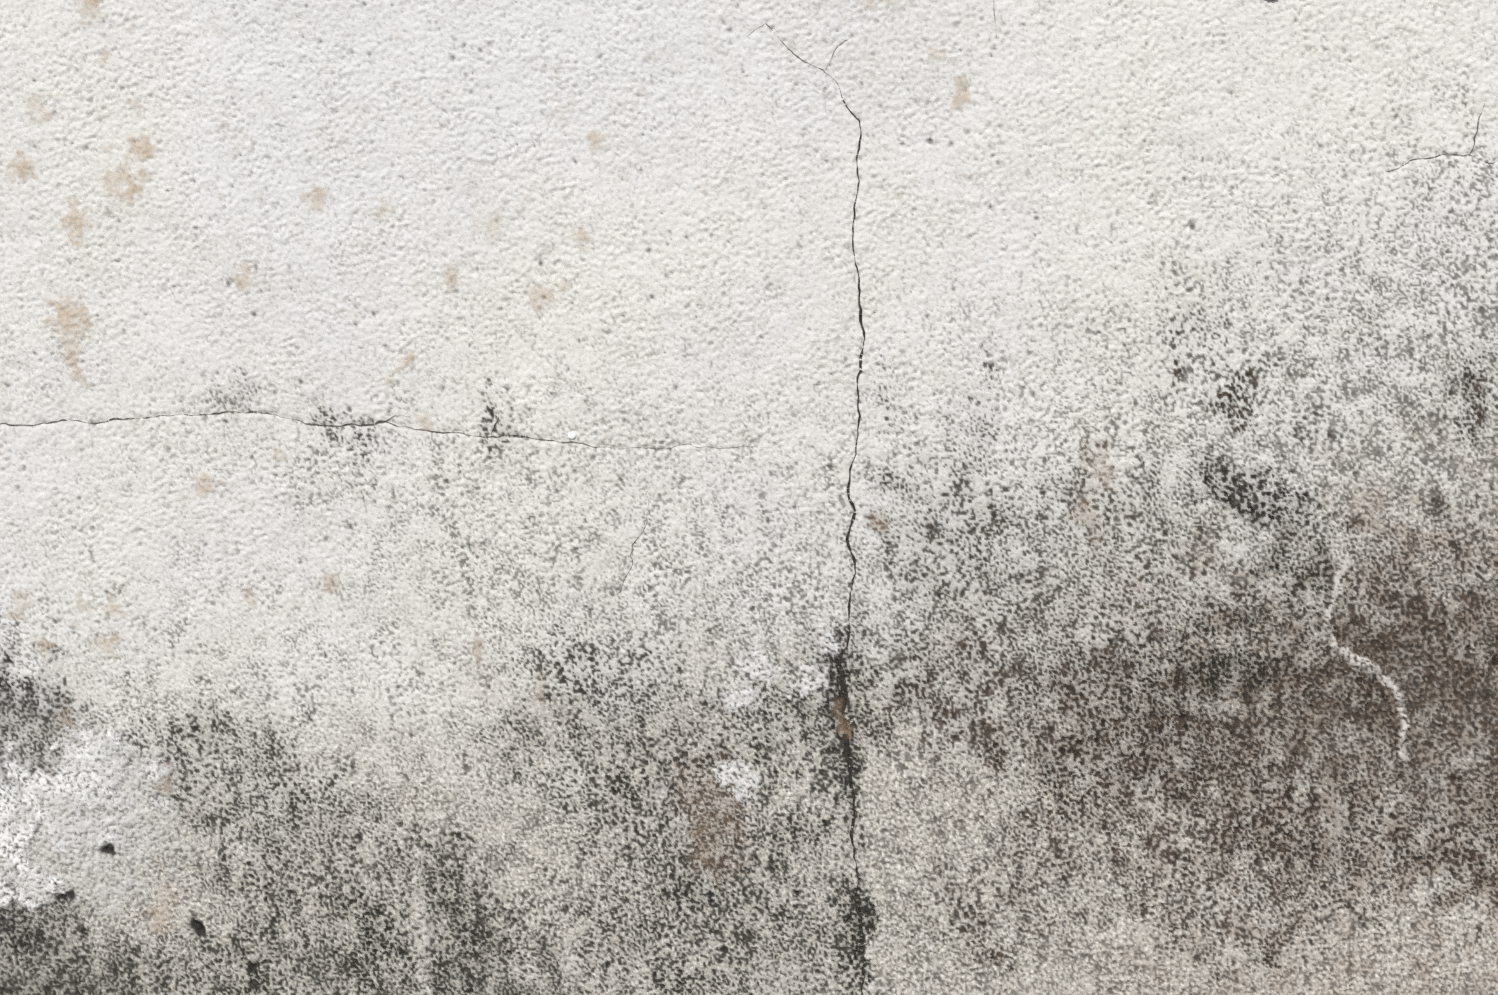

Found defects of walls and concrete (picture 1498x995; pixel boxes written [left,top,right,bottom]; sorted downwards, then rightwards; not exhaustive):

damp [312,408,375,461]
crack [0,405,755,449]
damp [481,406,523,451]
damp [1176,313,1281,432]
damp [1446,348,1498,442]
crack [749,23,867,995]
damp [0,424,1498,995]